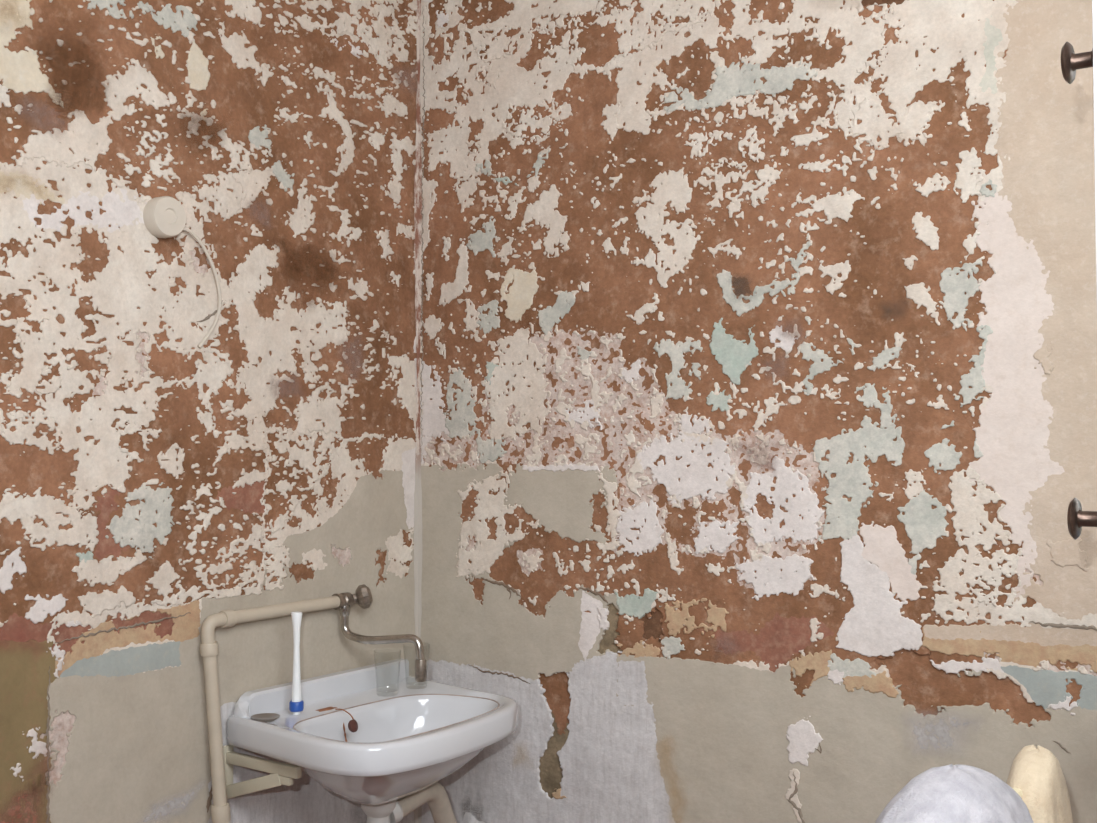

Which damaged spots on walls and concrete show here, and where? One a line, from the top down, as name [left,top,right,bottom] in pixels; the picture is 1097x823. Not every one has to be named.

peeling [0,0,418,656]
peeling [420,0,1078,727]
peeling [1046,536,1089,572]
peeling [1033,660,1097,676]
spalling [539,672,571,799]
crack [788,772,805,823]
spalling [786,716,823,823]